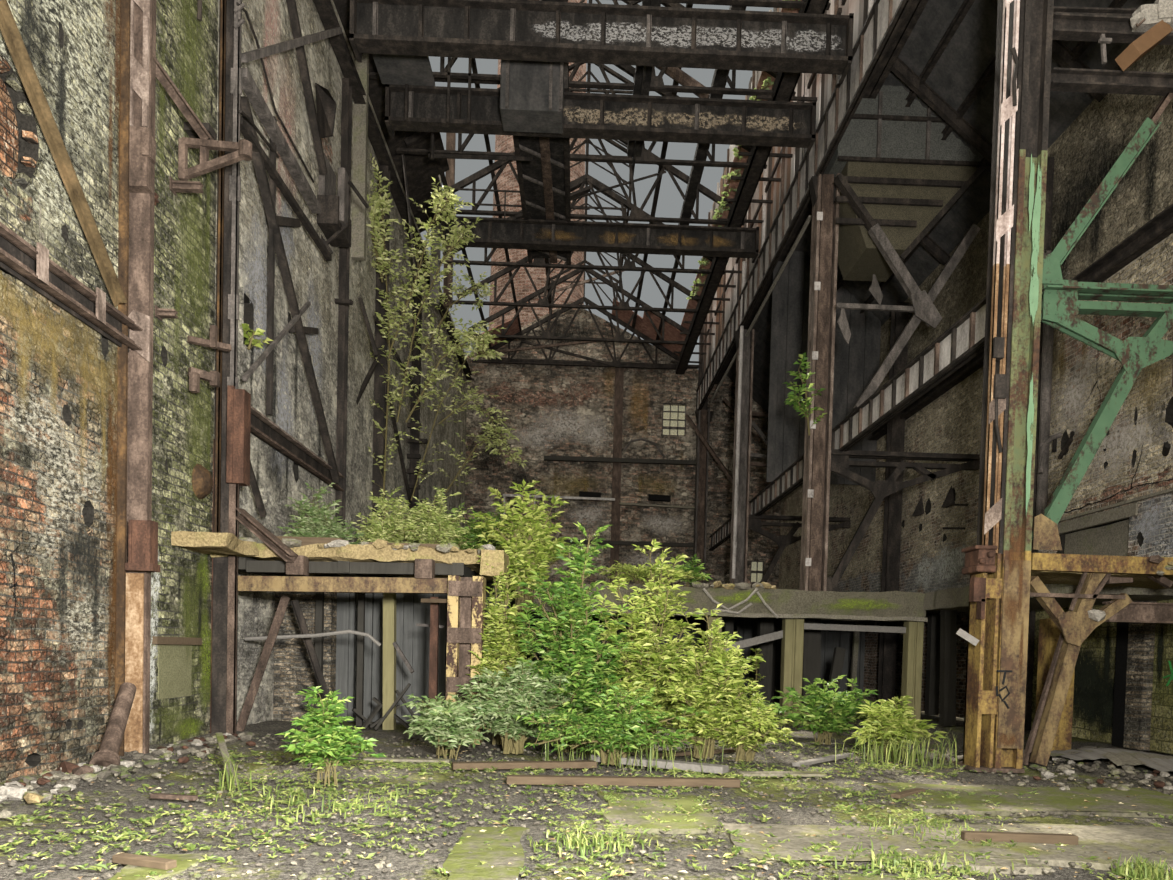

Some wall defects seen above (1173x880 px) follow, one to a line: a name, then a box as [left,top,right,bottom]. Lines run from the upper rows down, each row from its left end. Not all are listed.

spalling [0,34,72,237]
peeling [42,0,107,143]
peeling [1029,154,1042,325]
spalling [0,316,8,369]
spalling [1093,301,1169,341]
peeling [1026,374,1034,513]
peeling [1083,398,1173,542]
spalling [0,385,104,778]
leakage [59,525,100,630]
rust [1005,533,1023,671]